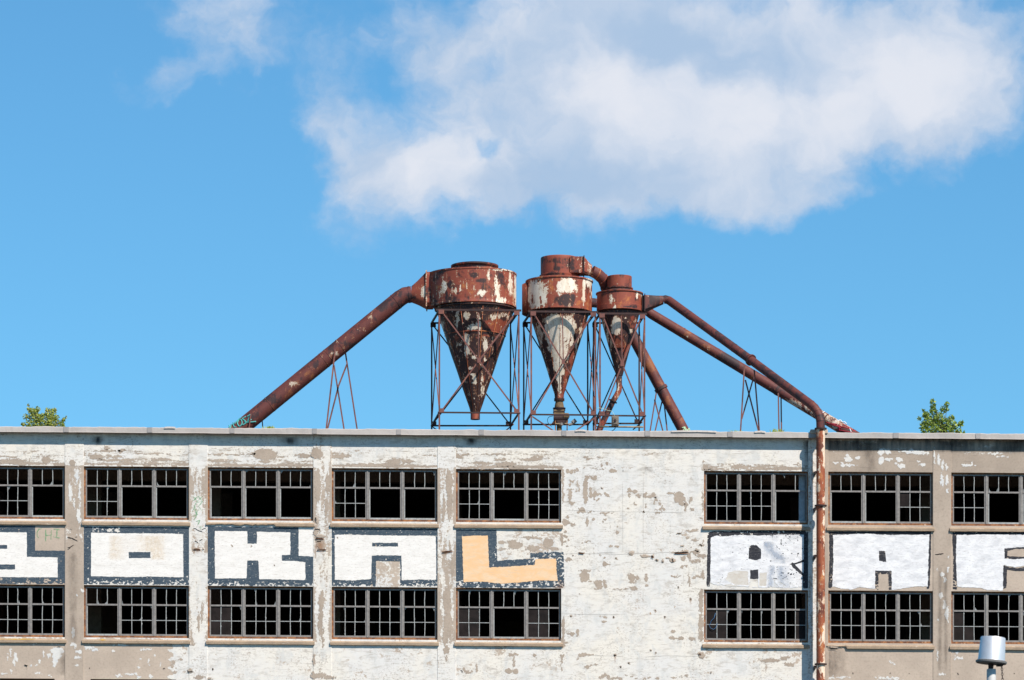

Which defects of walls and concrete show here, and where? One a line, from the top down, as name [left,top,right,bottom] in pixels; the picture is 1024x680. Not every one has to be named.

peeling [0,455,76,466]
peeling [85,445,172,465]
peeling [833,454,860,467]
peeling [877,449,929,469]
peeling [441,453,706,661]
peeling [190,602,205,646]
peeling [560,616,688,680]
peeling [504,652,519,674]